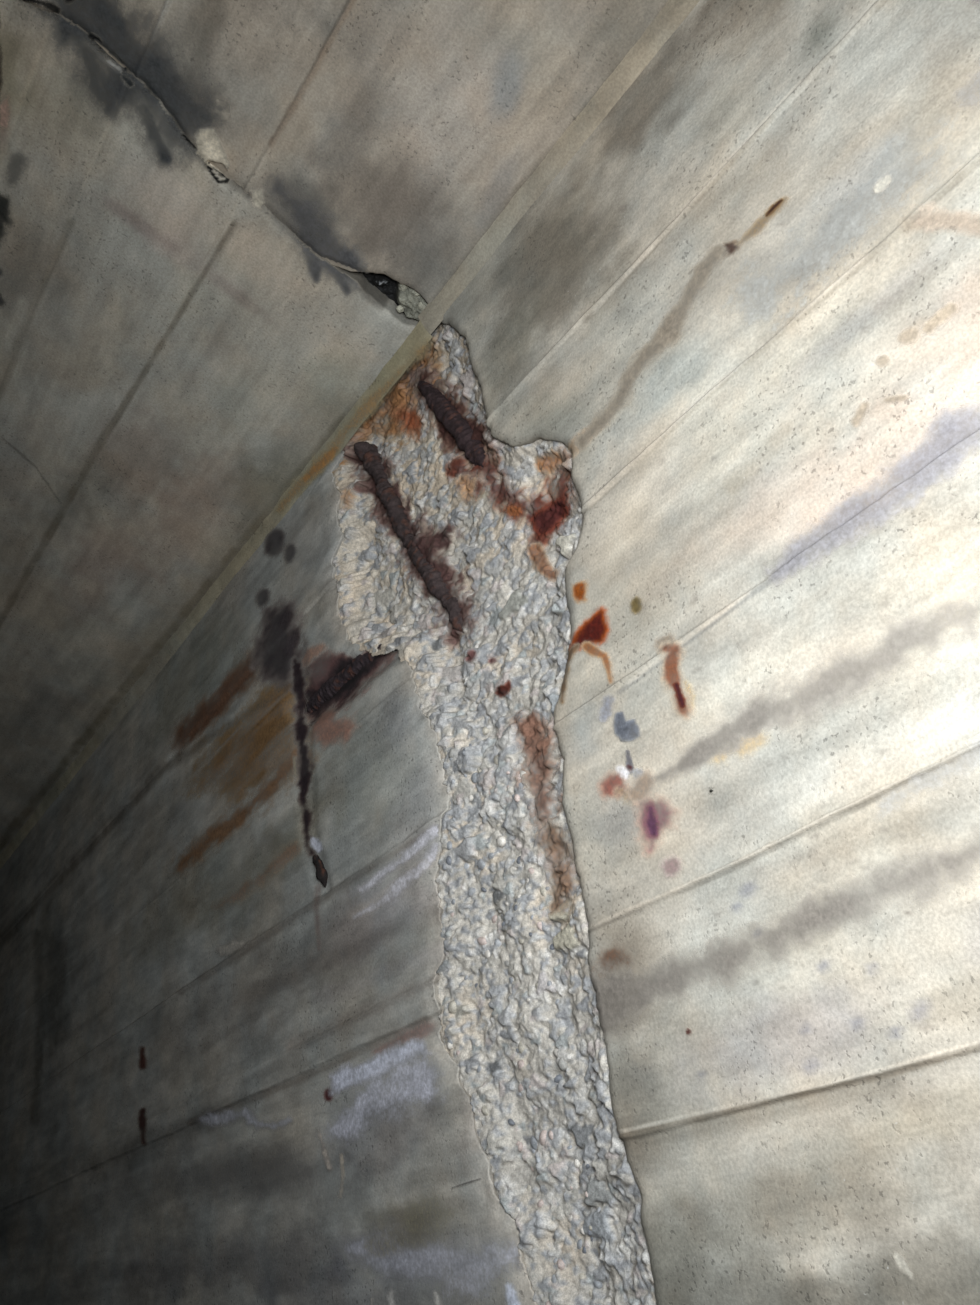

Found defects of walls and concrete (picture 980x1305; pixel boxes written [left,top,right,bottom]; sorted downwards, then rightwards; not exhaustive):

crack [23,0,75,16]
crack [88,33,134,87]
leakage [43,0,228,168]
mould [0,152,28,241]
leakage [270,175,367,296]
mould [264,528,296,563]
rust [276,335,574,664]
rust [559,581,612,704]
rust [172,599,397,874]
crack [291,658,323,935]
spalling [307,272,657,1305]
rust [509,710,575,914]